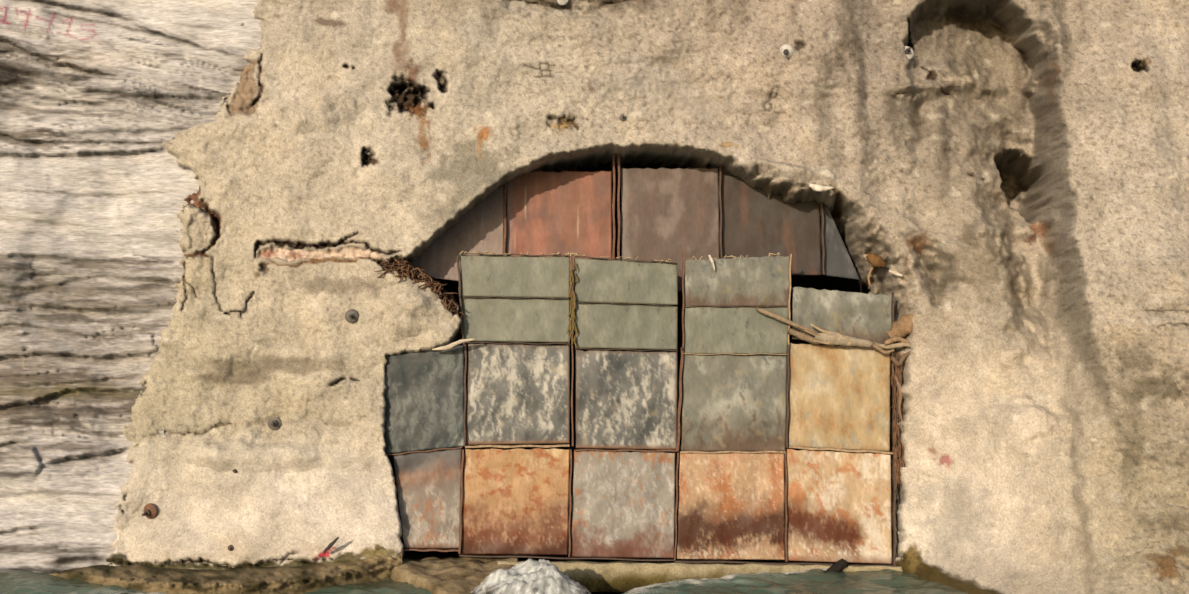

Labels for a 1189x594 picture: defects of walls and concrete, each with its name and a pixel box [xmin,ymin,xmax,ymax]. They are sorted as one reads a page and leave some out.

spalling [219,54,263,115]
spalling [389,71,447,117]
crack [254,233,401,257]
crack [181,258,254,318]